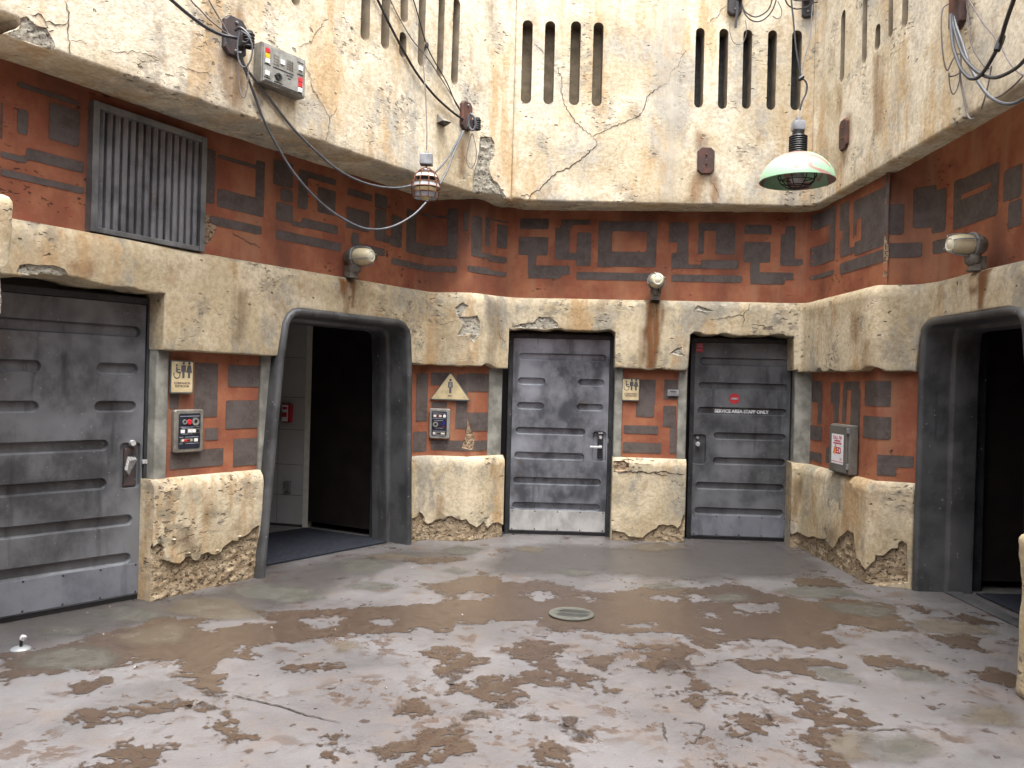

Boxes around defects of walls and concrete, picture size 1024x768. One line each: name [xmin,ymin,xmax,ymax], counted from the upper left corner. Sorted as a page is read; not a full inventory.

flaking render [8,17,55,49]
crack [521,46,686,199]
flaking render [472,136,506,197]
flaking render [455,303,480,342]
corrosion [644,301,659,368]
flaking render [412,512,502,543]
flaking render [612,515,685,542]
flaking render [150,526,259,602]
flaking render [789,530,907,586]